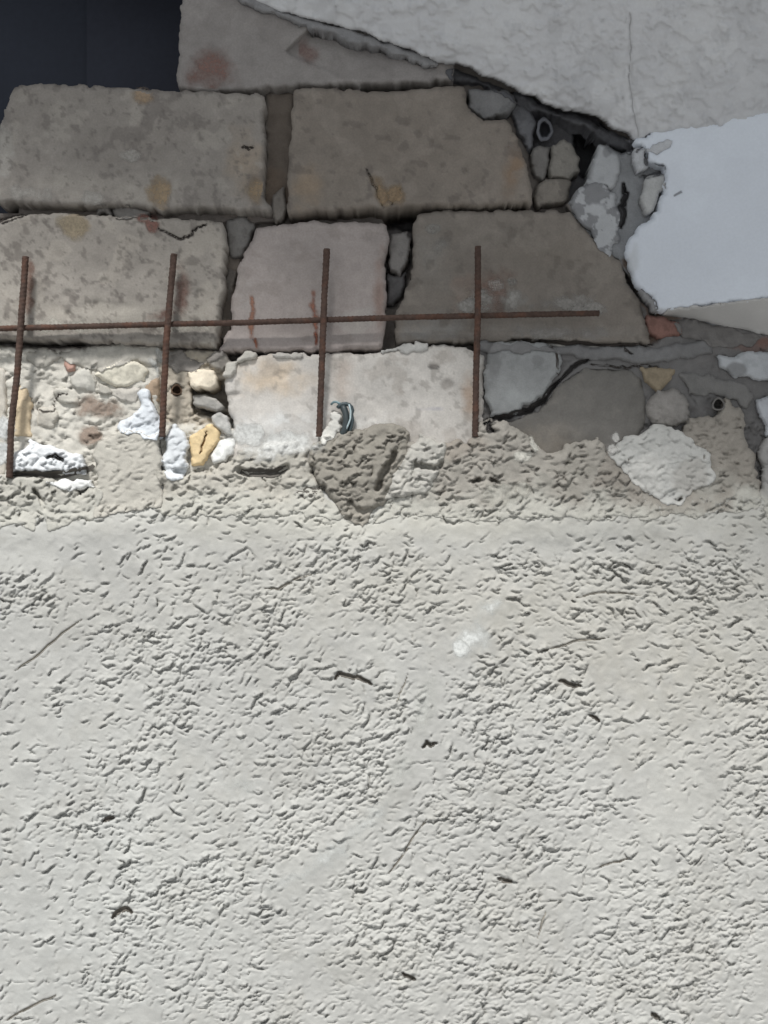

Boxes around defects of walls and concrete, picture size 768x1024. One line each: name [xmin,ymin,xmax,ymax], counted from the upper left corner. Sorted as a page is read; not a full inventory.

flaking render [631,139,672,217]
crack [148,215,207,240]
flaking render [636,289,658,316]
spalling [0,246,600,478]